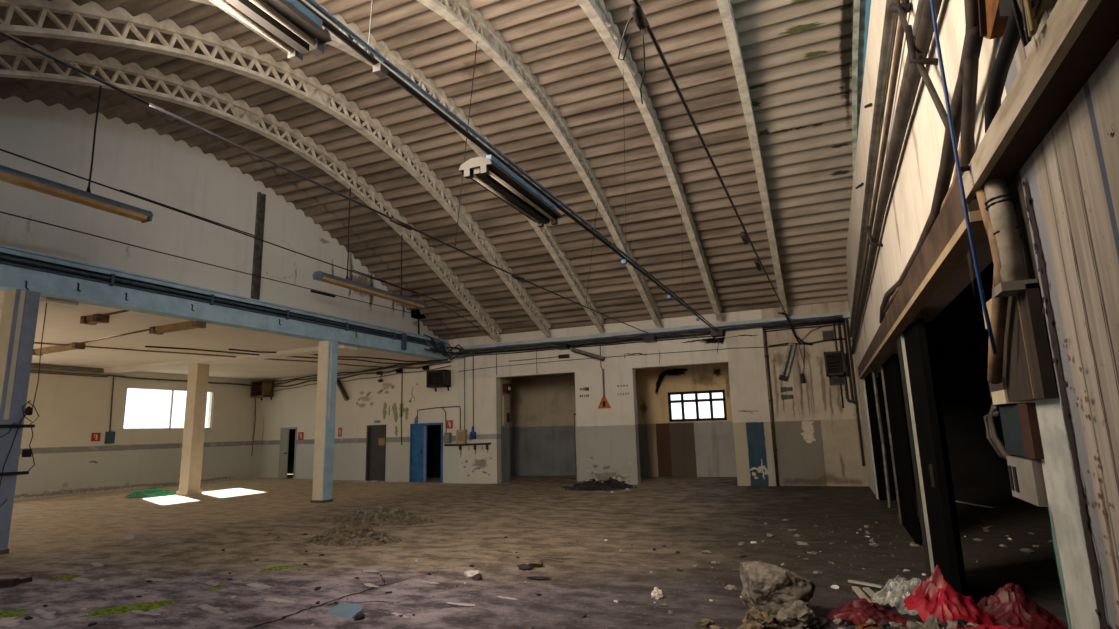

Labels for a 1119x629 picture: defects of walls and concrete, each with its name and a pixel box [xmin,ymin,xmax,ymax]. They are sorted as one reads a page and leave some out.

water stain [780,0,854,148]
peeling [800,420,816,443]
peeling [748,459,774,480]